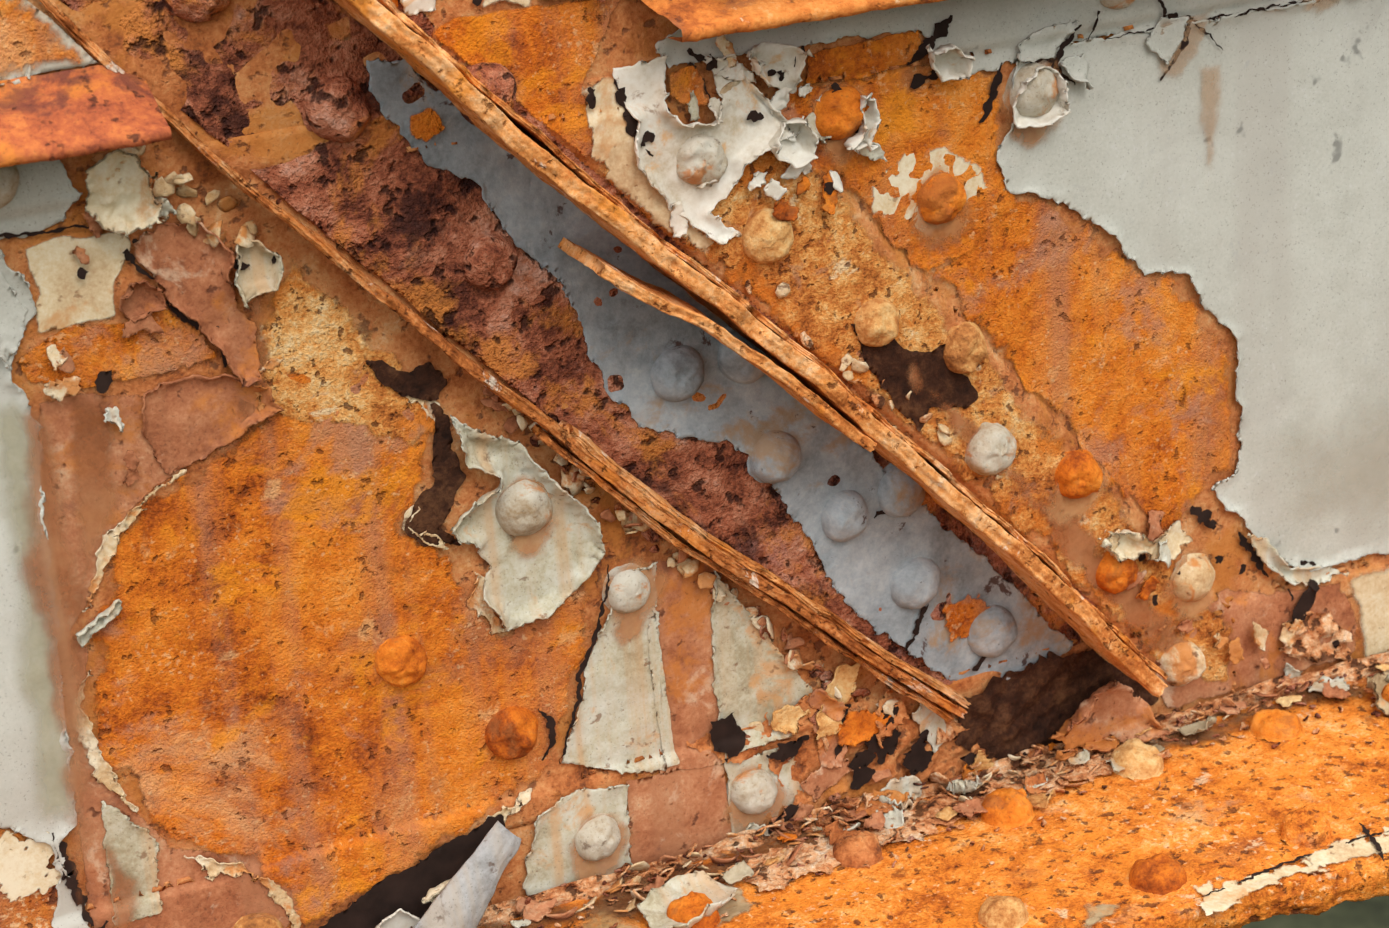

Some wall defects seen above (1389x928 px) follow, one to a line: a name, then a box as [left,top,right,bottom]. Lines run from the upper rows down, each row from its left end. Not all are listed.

crack [979,0,1321,123]
crack [0,224,89,239]
crack [123,249,228,368]
corrosion [376,0,1237,682]
peeling [319,0,1389,928]
peeling [0,145,302,928]
corrosion [19,264,589,928]
corrosion [531,420,971,774]
corrosion [1049,679,1324,752]
corrosion [0,857,58,928]
corrosion [480,784,829,928]
corrosion [904,802,928,822]